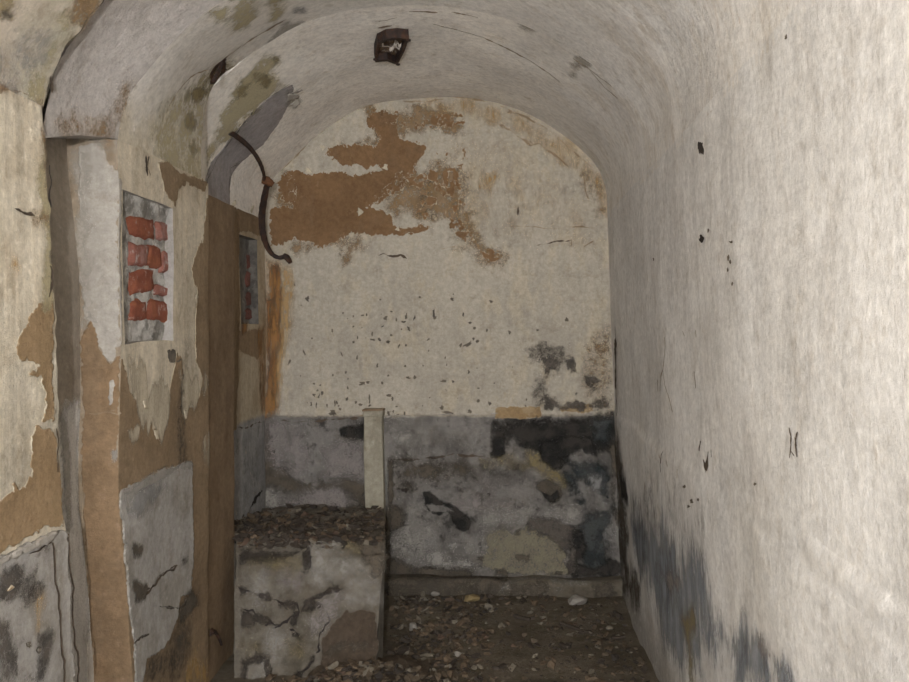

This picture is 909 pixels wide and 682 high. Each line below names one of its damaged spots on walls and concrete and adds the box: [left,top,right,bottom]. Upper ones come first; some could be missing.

flaking render [0,299,80,682]
spalling [80,161,210,682]
water stain [239,549,299,603]
rust [258,261,293,418]
crack [238,585,344,679]
crack [302,547,312,573]
spalling [232,104,510,430]
water stain [305,335,792,682]